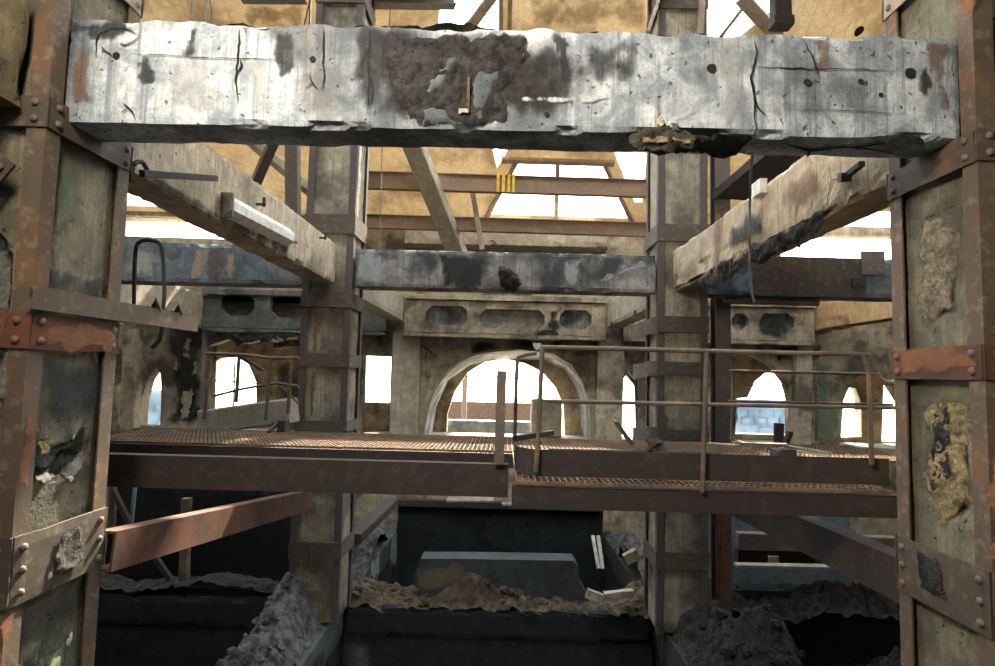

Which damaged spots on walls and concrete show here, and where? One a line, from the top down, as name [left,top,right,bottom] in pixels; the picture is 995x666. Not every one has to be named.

spalling [383,31,528,128]
crack [750,38,901,134]
spalling [628,117,752,159]
crack [784,143,909,208]
spalling [498,266,522,292]
spalling [695,210,825,292]
spalling [917,212,961,326]
rust [45,323,116,354]
rust [903,344,975,372]
spalling [34,428,89,483]
spalling [923,398,973,525]
rust [1,615,13,637]